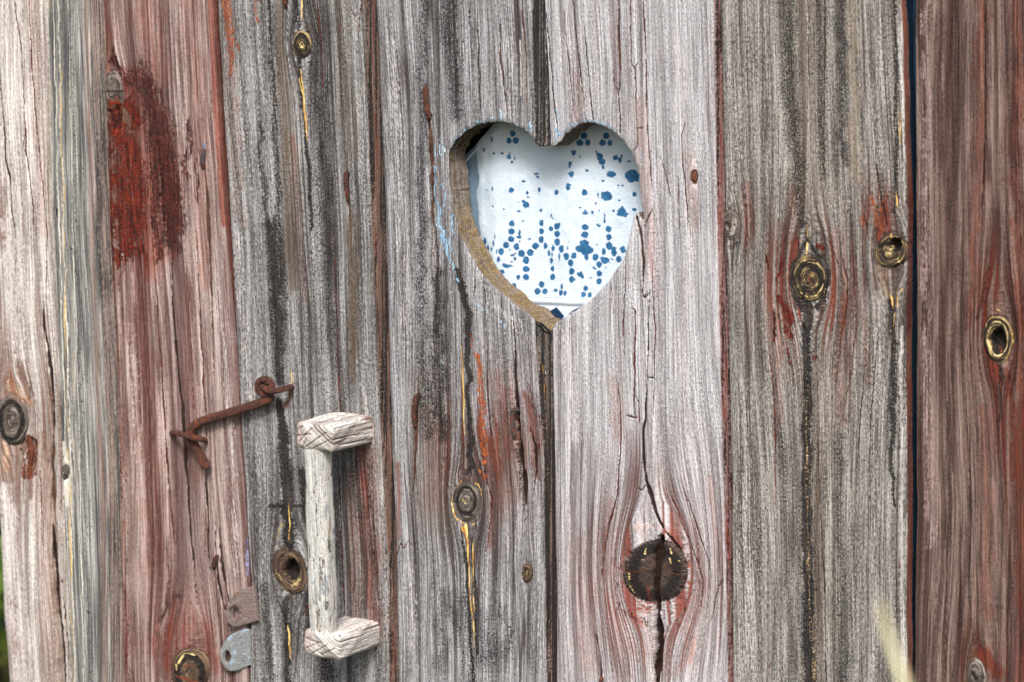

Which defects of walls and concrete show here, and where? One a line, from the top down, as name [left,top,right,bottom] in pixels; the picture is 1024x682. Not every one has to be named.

crack [473,0,730,682]